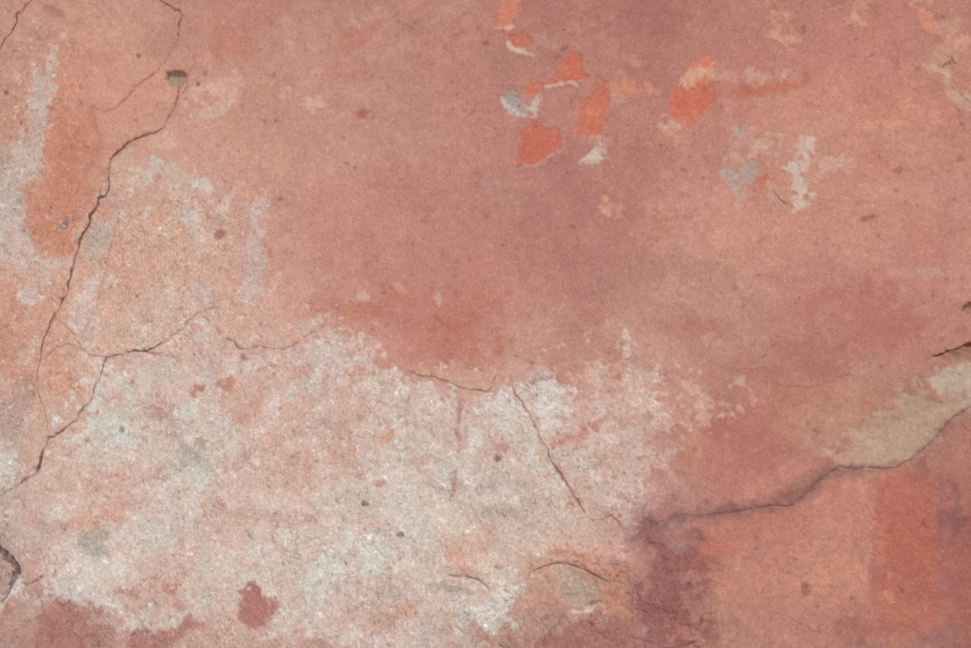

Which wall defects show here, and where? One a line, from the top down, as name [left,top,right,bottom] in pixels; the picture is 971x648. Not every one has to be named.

peeling [479,0,536,59]
peeling [763,0,804,53]
water stain [0,39,75,274]
peeling [498,48,856,221]
crack [0,0,325,607]
water stain [224,195,281,317]
water stain [458,158,651,321]
crack [927,341,971,362]
crack [405,367,971,545]
spalling [790,352,971,476]
water stain [118,590,224,642]
crack [526,558,643,587]